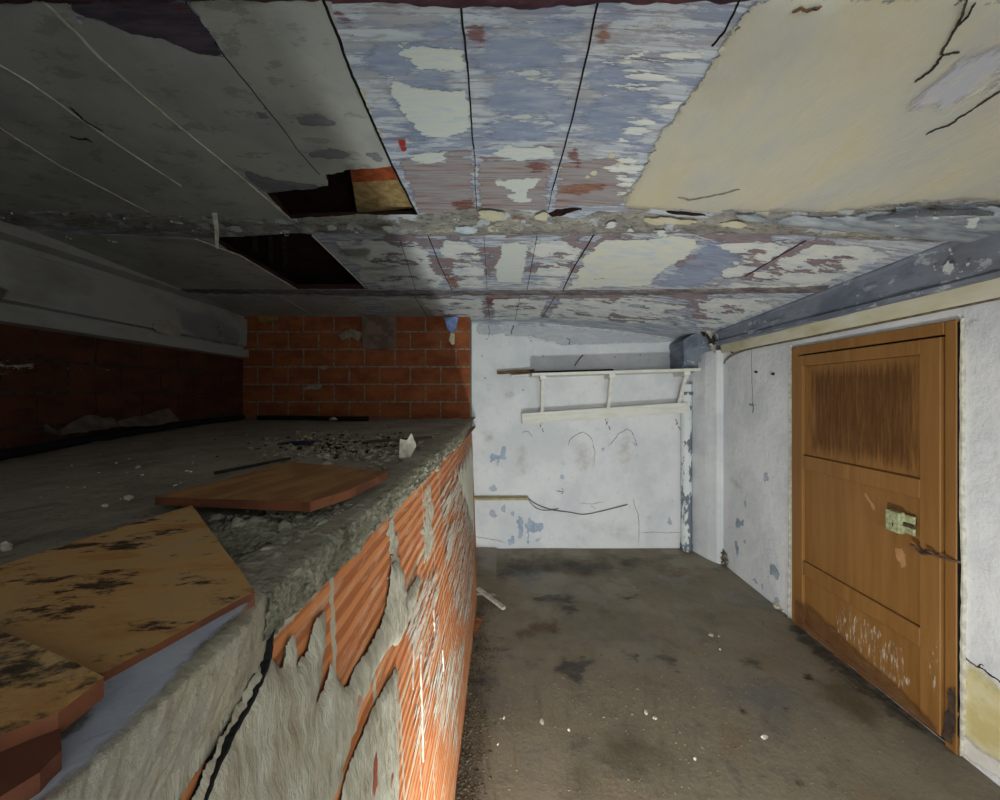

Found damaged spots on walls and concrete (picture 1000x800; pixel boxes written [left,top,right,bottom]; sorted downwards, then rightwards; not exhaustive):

peeling [398,41,466,72]
peeling [487,56,570,90]
peeling [602,50,705,96]
crack [915,0,976,83]
peeling [387,75,471,138]
crack [926,91,1000,135]
peeling [244,171,319,193]
peeling [324,101,1000,353]
peeling [490,446,506,465]
spalling [237,417,473,642]
peeling [489,505,544,546]
crack [190,628,275,800]